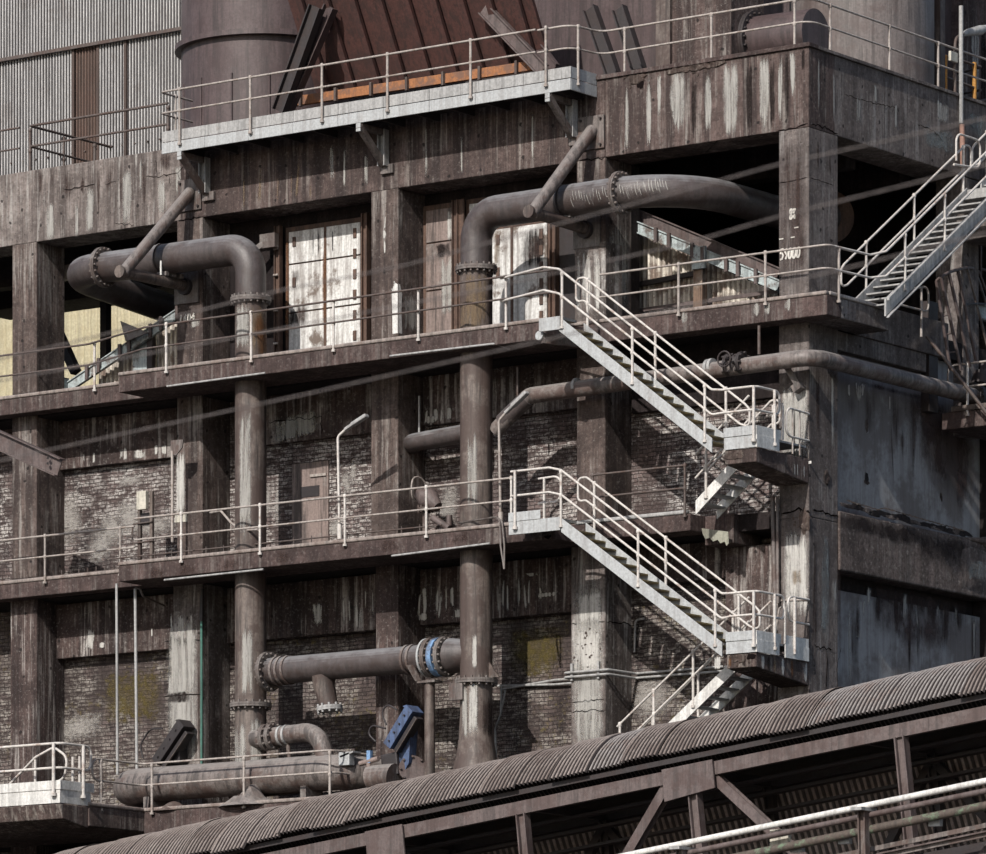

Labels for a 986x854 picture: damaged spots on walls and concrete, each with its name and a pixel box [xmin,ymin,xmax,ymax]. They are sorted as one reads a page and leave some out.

damp [646,74,711,143]
damp [724,50,804,132]
peeling [391,281,417,334]
spalling [840,500,973,537]
damp [813,540,975,662]